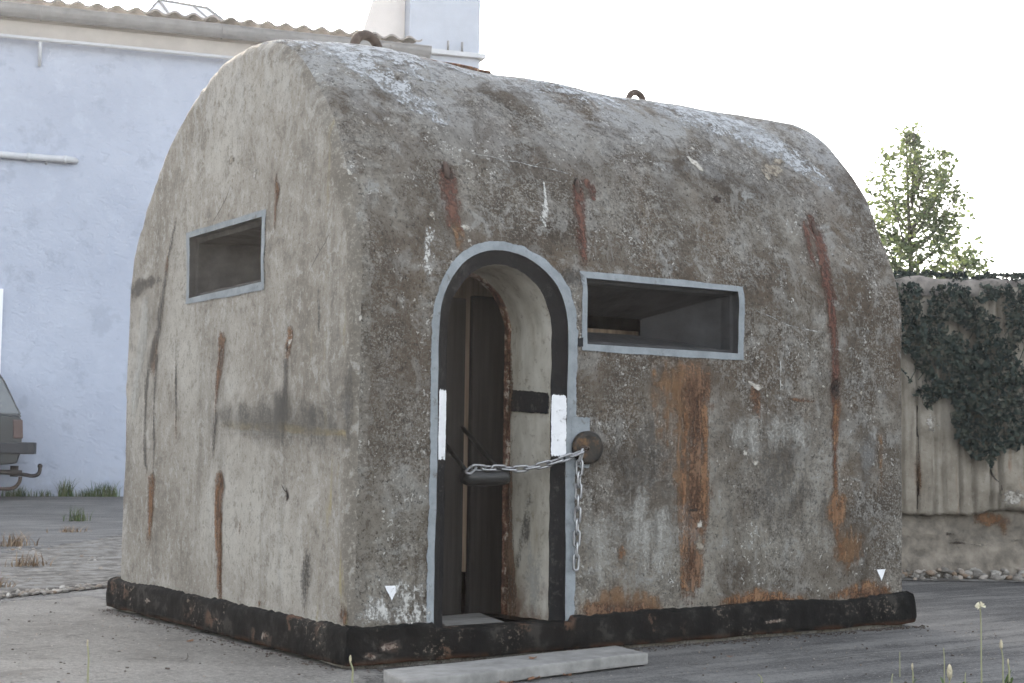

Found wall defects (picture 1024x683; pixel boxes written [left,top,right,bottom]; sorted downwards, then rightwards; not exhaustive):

corrosion [438,161,464,251]
corrosion [572,178,596,265]
corrosion [212,331,225,450]
corrosion [282,326,293,431]
corrosion [803,214,863,570]
corrosion [147,473,155,540]
corrosion [214,471,224,599]
corrosion [651,360,714,604]
corrosion [579,586,661,616]
corrosion [722,587,807,604]
corrosion [829,579,890,599]